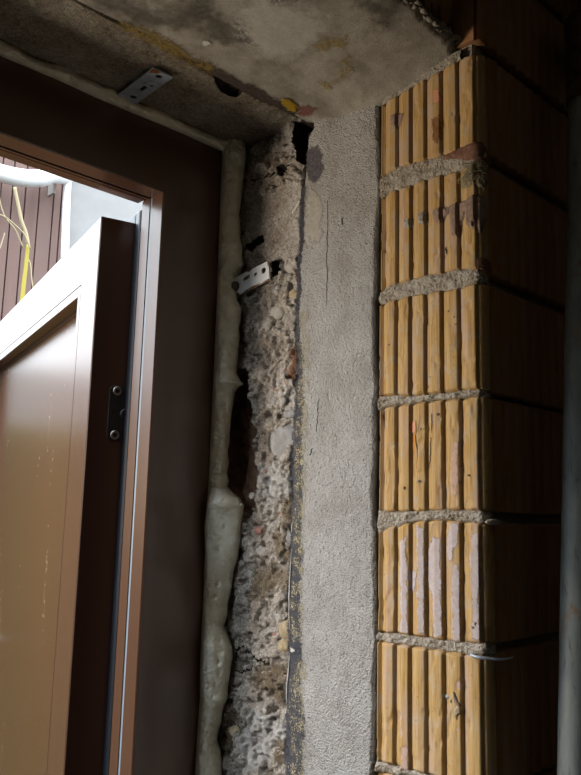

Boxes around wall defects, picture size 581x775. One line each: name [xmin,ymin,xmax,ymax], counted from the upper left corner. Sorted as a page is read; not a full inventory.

spalling [214,76,242,97]
spalling [292,120,315,166]
spalling [246,235,265,252]
spalling [271,259,282,277]
spalling [228,368,260,515]
crack [235,645,270,674]